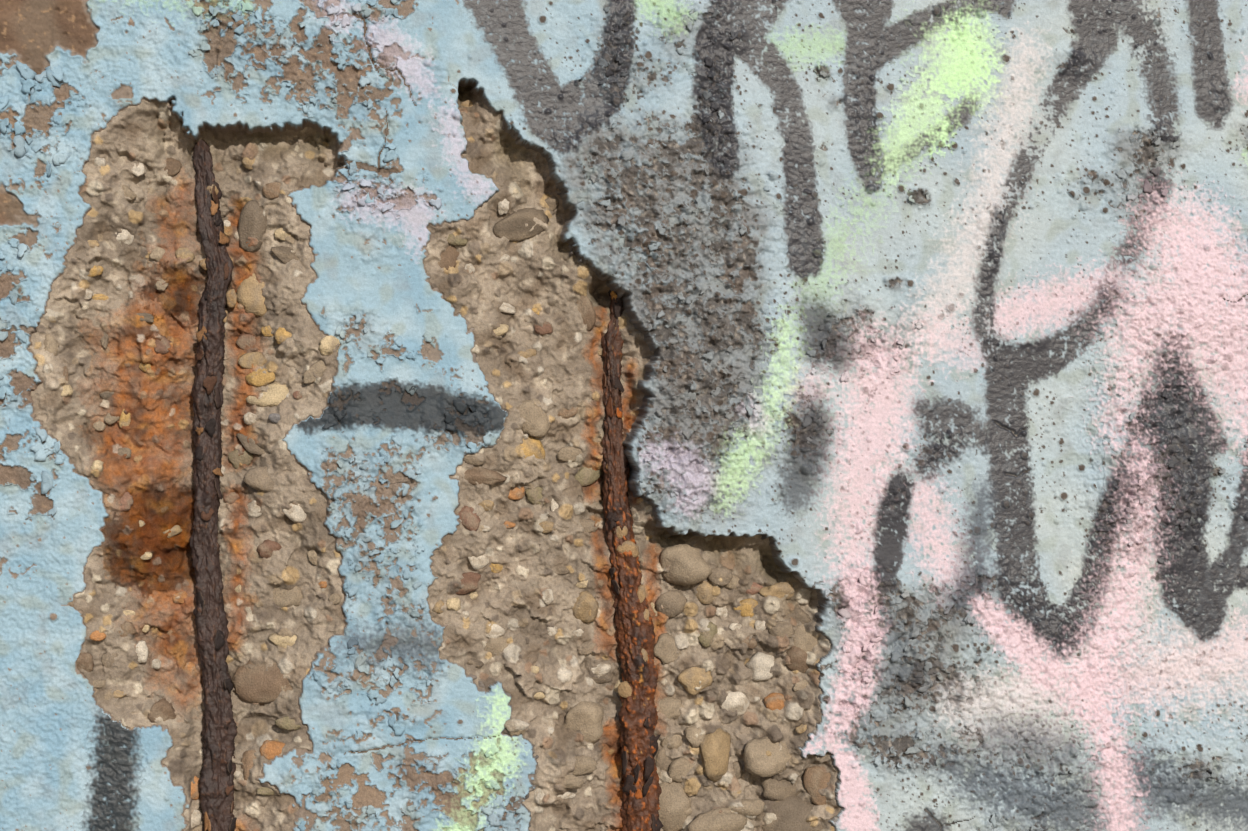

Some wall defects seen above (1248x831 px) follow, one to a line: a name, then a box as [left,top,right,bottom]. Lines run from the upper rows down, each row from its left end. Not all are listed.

peeling [188,0,414,120]
flaking render [591,0,641,101]
flaking render [659,8,721,31]
corrosion [70,154,208,724]
corrosion [219,192,272,655]
spalling [0,30,1002,831]
corrosion [579,304,620,665]
corrosion [621,356,645,449]
corrosion [640,540,670,738]
corrosion [235,808,261,831]
corrosion [598,716,624,831]
flaking render [968,706,1096,831]